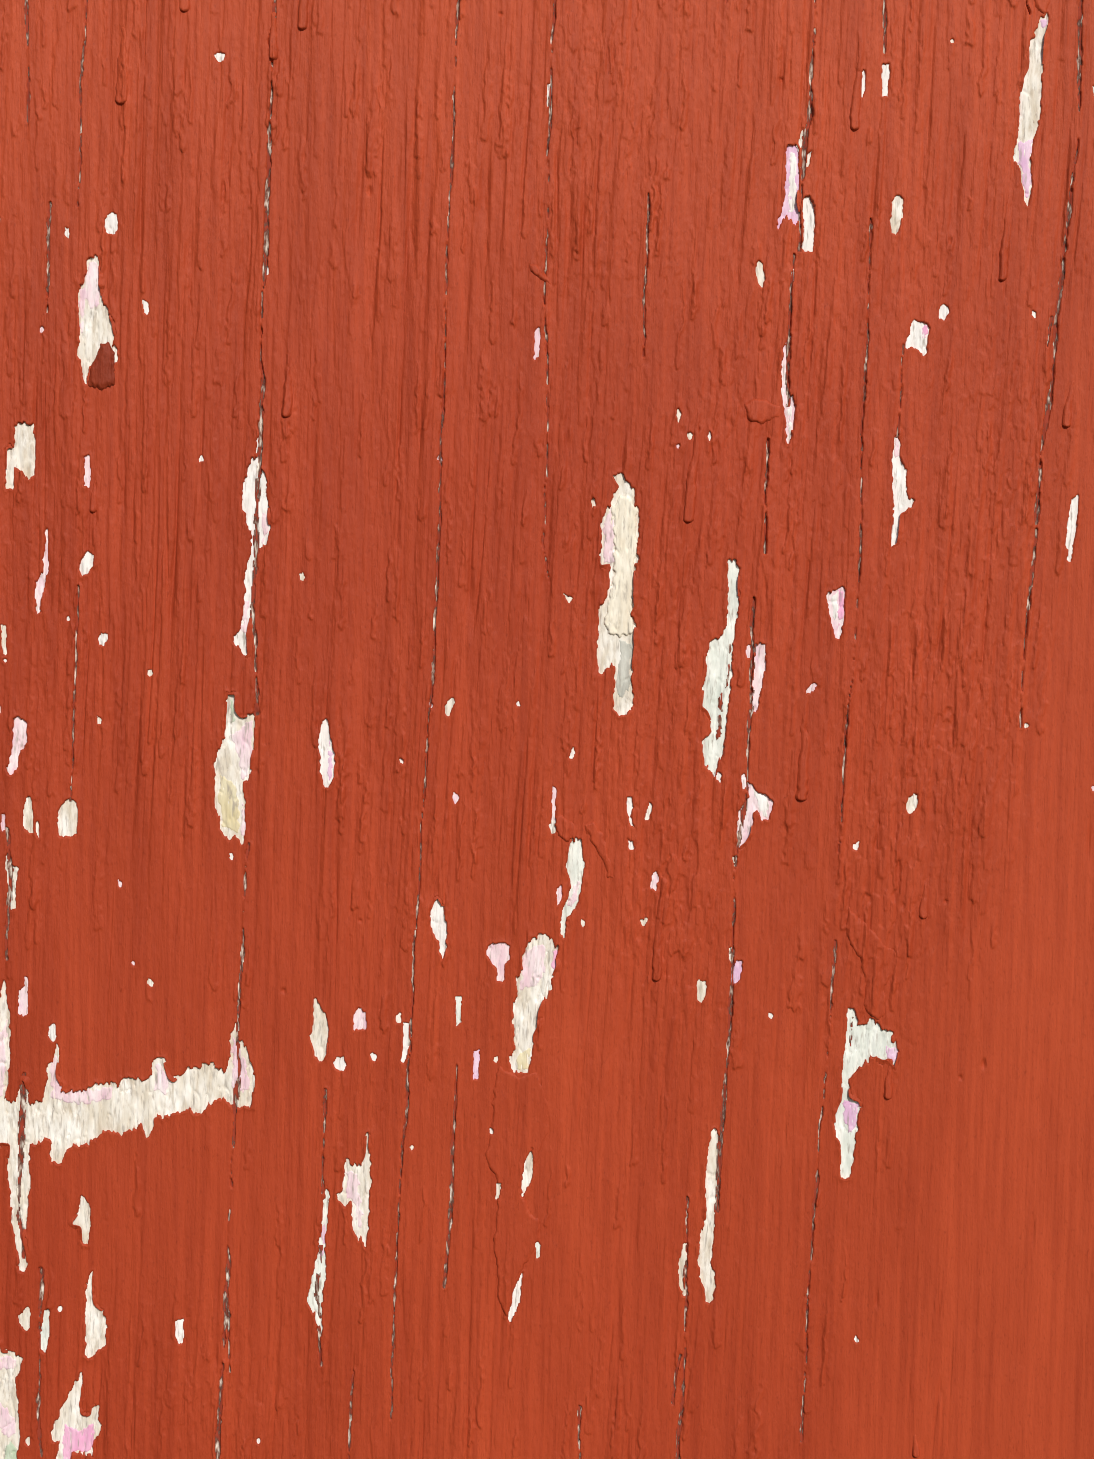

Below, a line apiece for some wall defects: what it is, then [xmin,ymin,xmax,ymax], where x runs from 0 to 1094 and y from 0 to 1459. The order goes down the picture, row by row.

crack [785,0,816,407]
peeling [214,691,255,860]
peeling [591,473,639,716]
peeling [698,559,766,782]
crack [762,438,770,554]
crack [1019,0,1083,728]
peeling [0,976,255,1272]
crack [215,843,250,1459]
peeling [473,786,614,1322]
crack [671,597,756,1459]
peeling [832,1008,900,1179]
peeling [51,1271,107,1459]